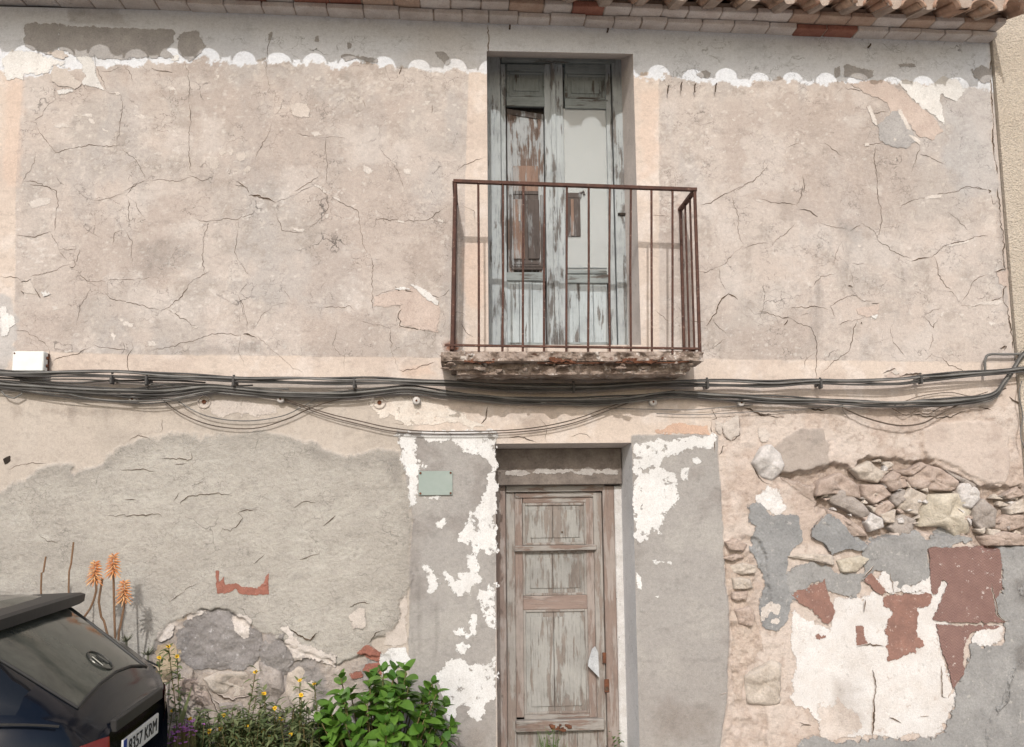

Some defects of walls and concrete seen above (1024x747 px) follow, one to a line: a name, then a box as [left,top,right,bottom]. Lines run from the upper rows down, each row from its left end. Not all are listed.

peeling [2,22,206,95]
peeling [341,43,378,63]
peeling [834,64,965,144]
peeling [971,65,992,84]
crack [4,56,475,372]
crack [695,49,1014,375]
spalling [373,284,440,333]
crack [109,453,251,530]
peeling [632,415,740,543]
peeling [367,395,618,738]
peeling [724,458,1024,747]
spalling [155,609,337,747]